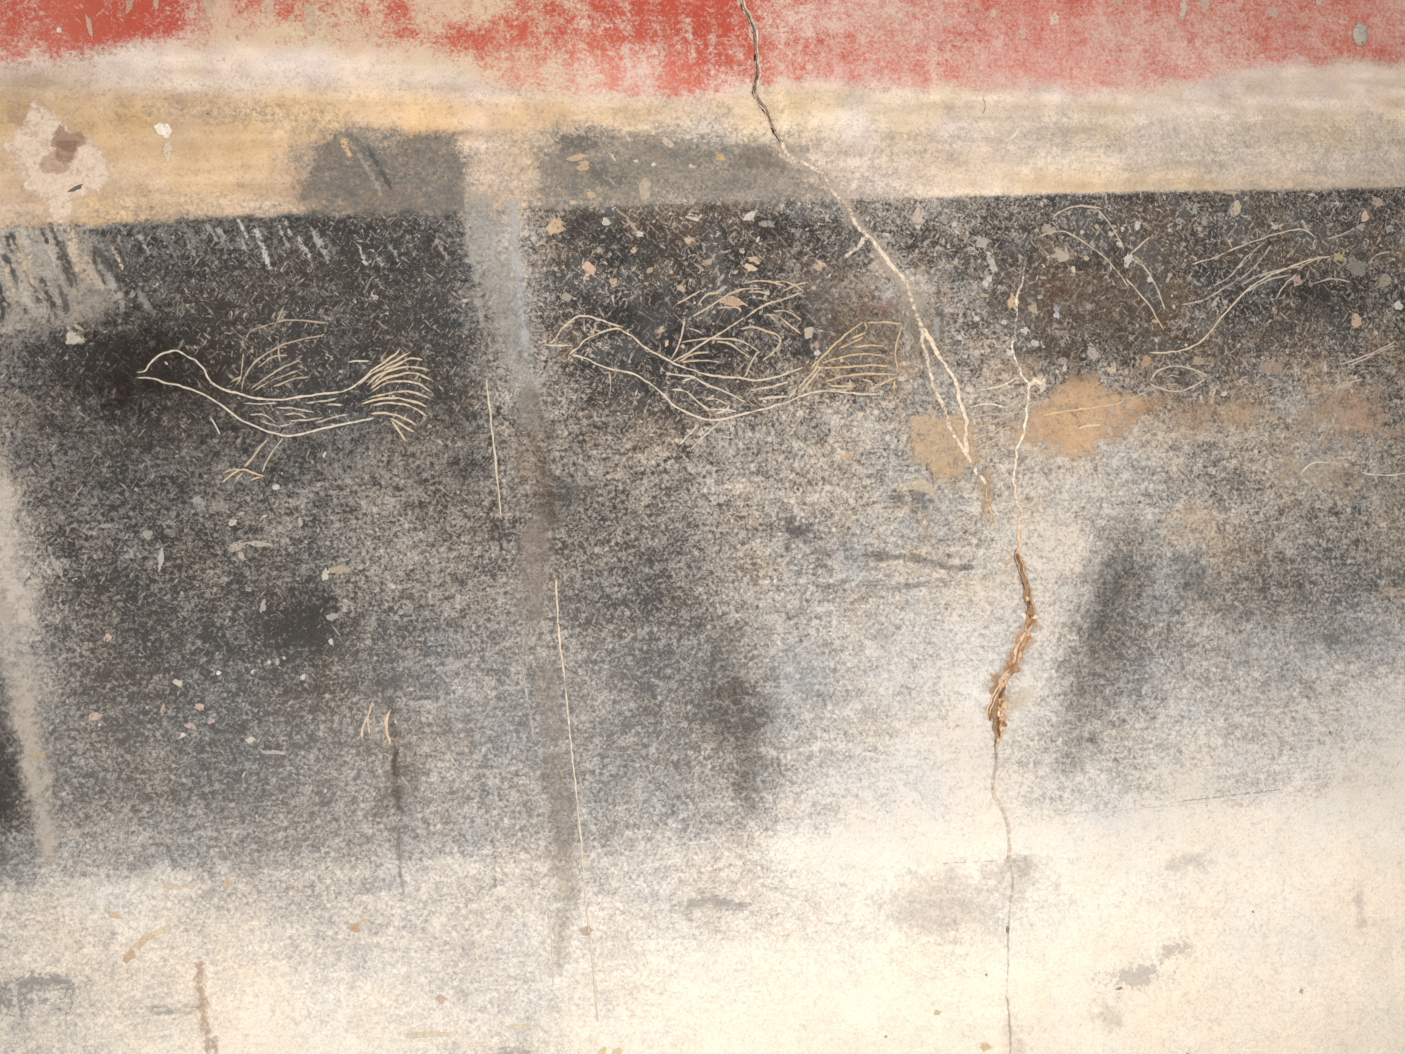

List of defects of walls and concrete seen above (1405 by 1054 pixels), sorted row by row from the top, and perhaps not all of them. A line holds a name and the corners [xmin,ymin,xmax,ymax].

crack [737,0,1045,856]
water stain [913,415,977,478]
water stain [1017,374,1158,457]
water stain [0,460,59,863]